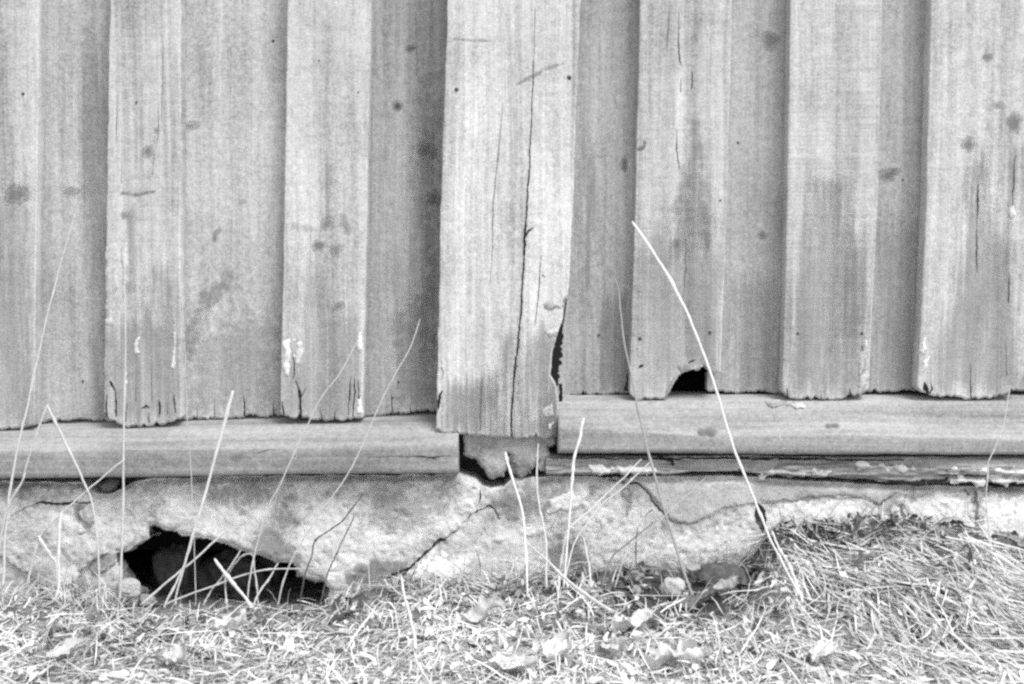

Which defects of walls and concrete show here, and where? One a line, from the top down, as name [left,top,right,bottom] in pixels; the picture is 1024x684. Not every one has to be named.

crack [510,30,567,438]
crack [546,456,1024,524]
spalling [88,524,176,606]
spalling [296,570,329,601]
crack [388,490,500,577]